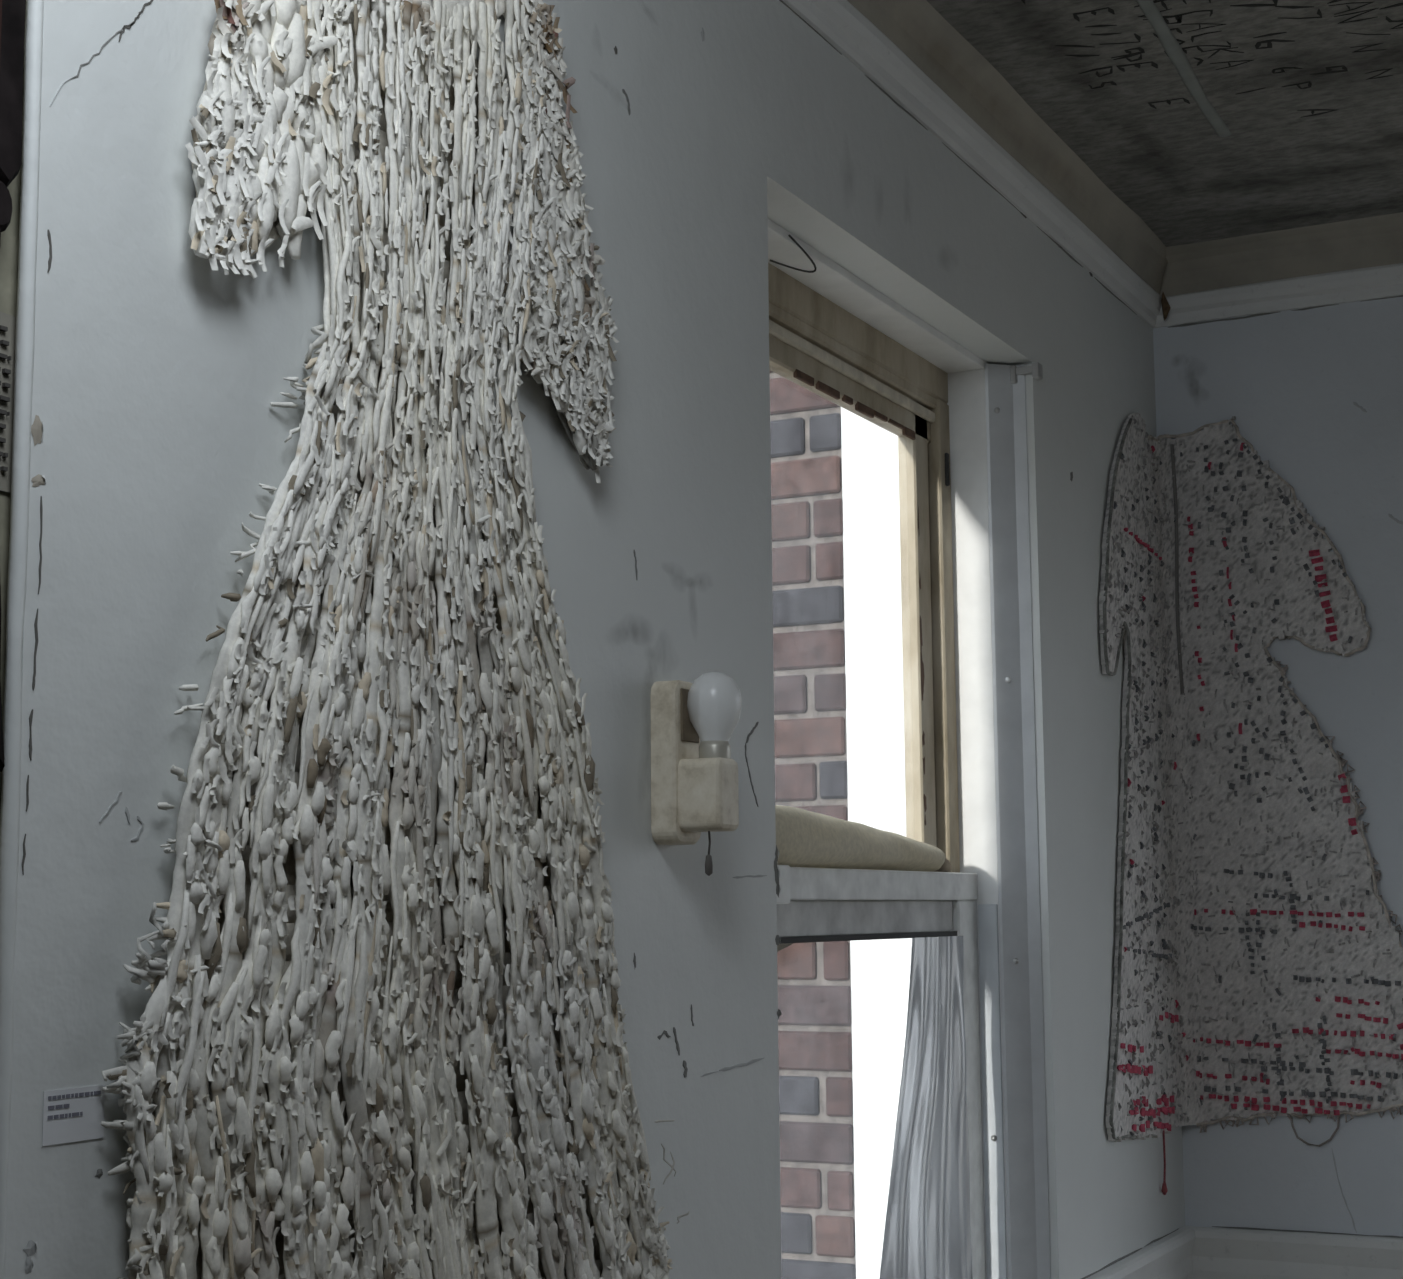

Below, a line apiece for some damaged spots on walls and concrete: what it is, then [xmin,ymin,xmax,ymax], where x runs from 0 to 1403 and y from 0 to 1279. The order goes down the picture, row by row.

crack [50,0,153,106]